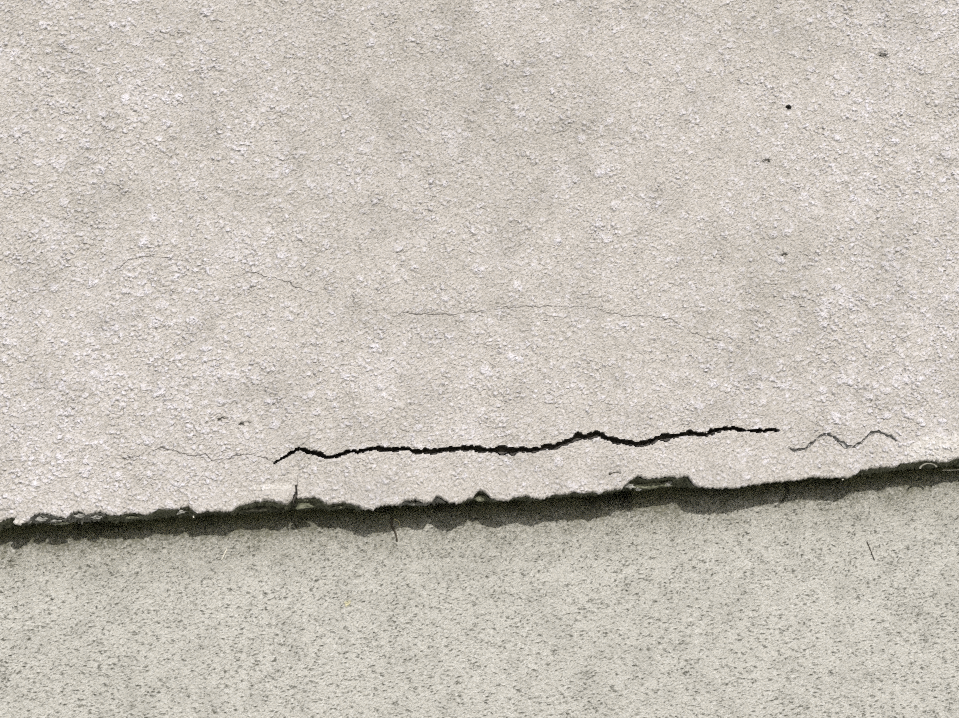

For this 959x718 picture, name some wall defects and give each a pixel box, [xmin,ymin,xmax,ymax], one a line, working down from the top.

crack [122,426,777,505]
crack [791,431,896,452]